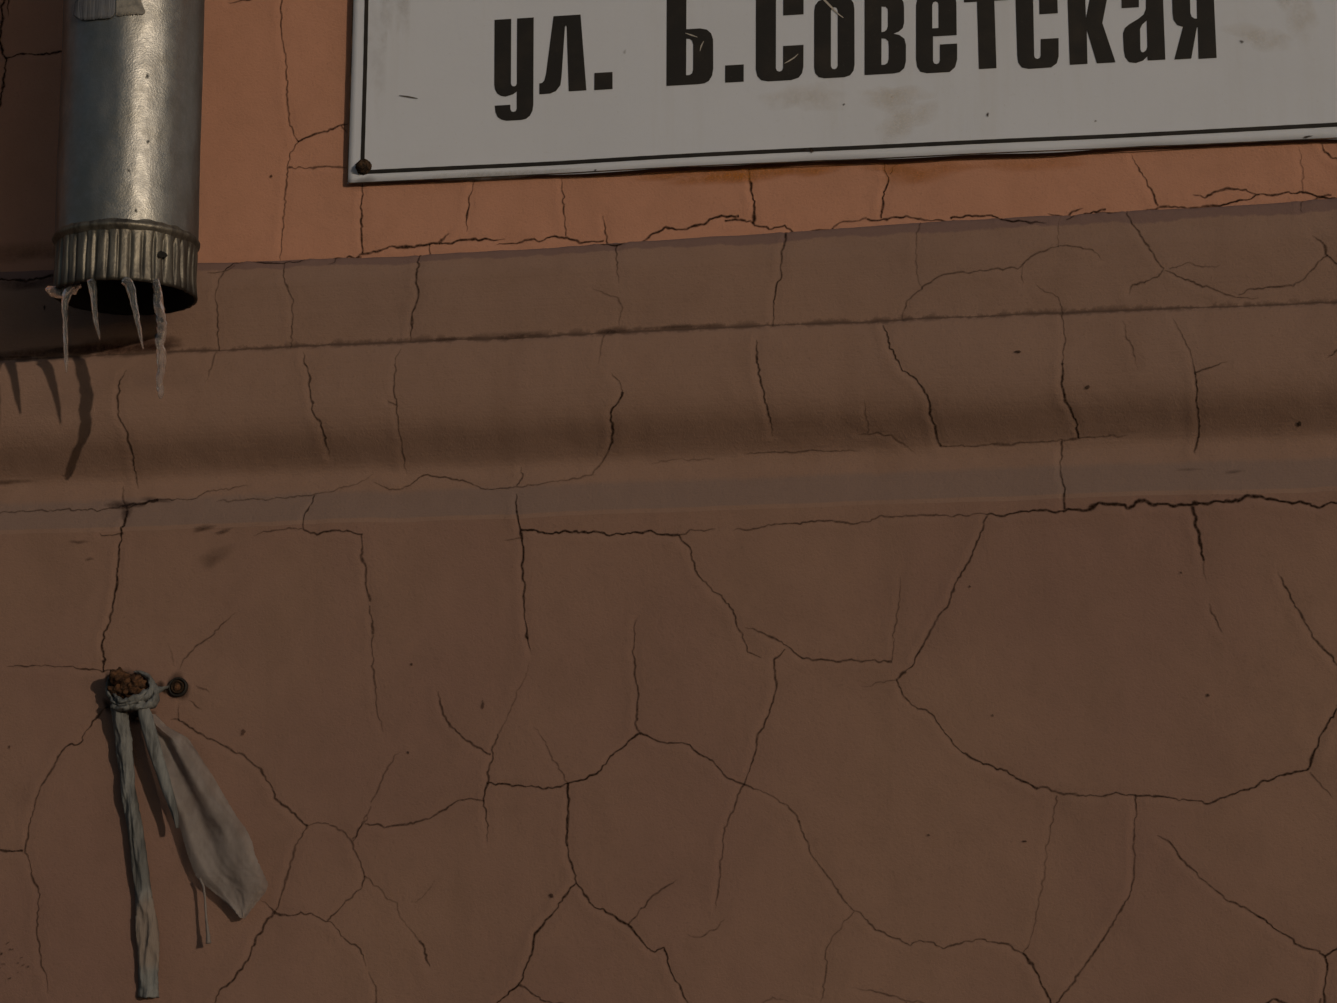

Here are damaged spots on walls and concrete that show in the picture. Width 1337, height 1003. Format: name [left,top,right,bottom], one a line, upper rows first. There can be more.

crack [0,0,62,106]
crack [216,0,1335,445]
crack [0,710,103,976]
crack [17,379,204,672]
crack [179,720,308,838]
crack [215,328,1337,1003]